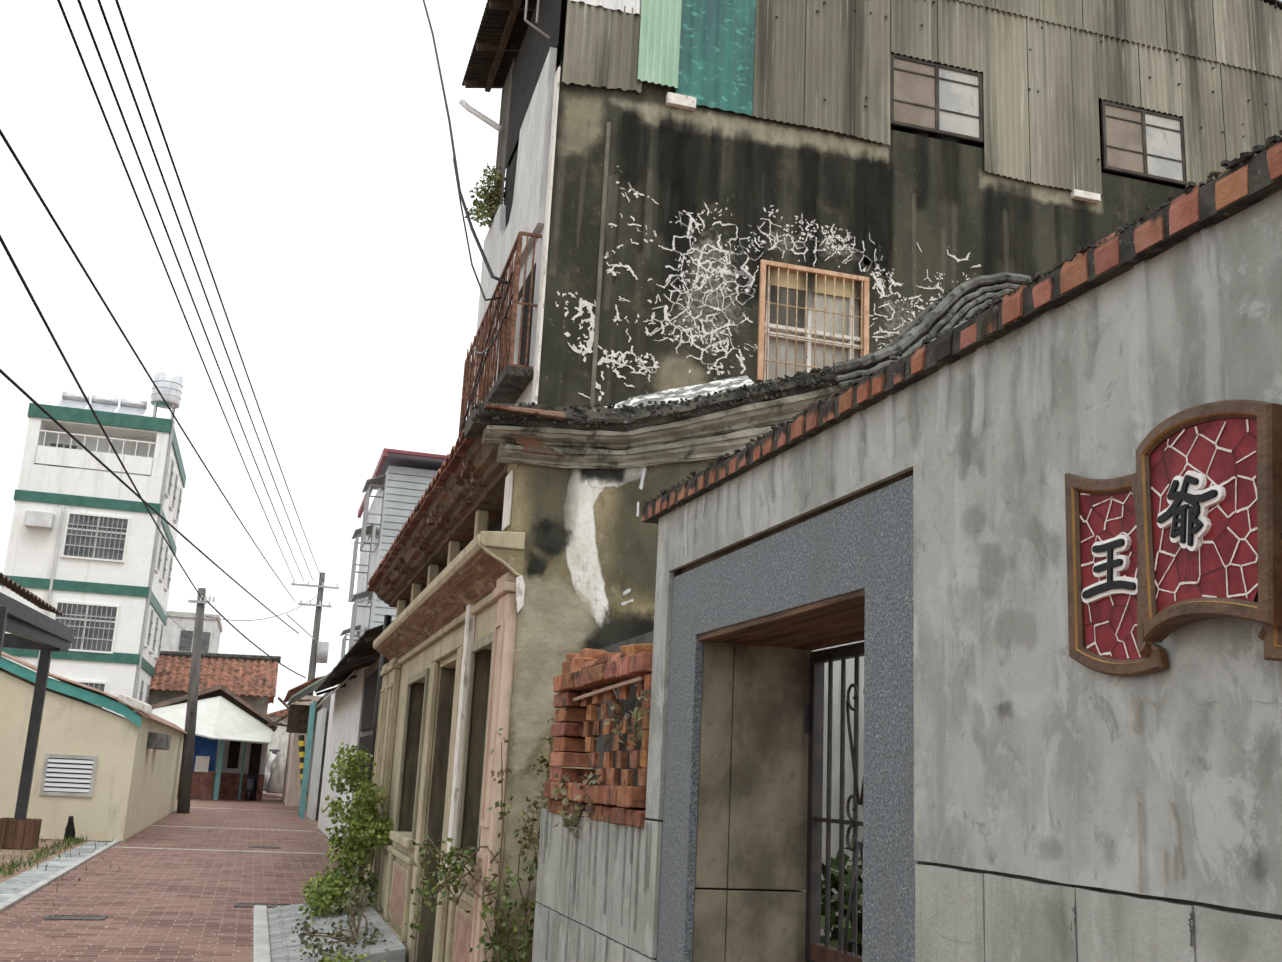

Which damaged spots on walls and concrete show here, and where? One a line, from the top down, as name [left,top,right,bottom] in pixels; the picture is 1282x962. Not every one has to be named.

damp [613,99,892,306]
crack [556,166,981,401]
damp [980,173,1102,276]